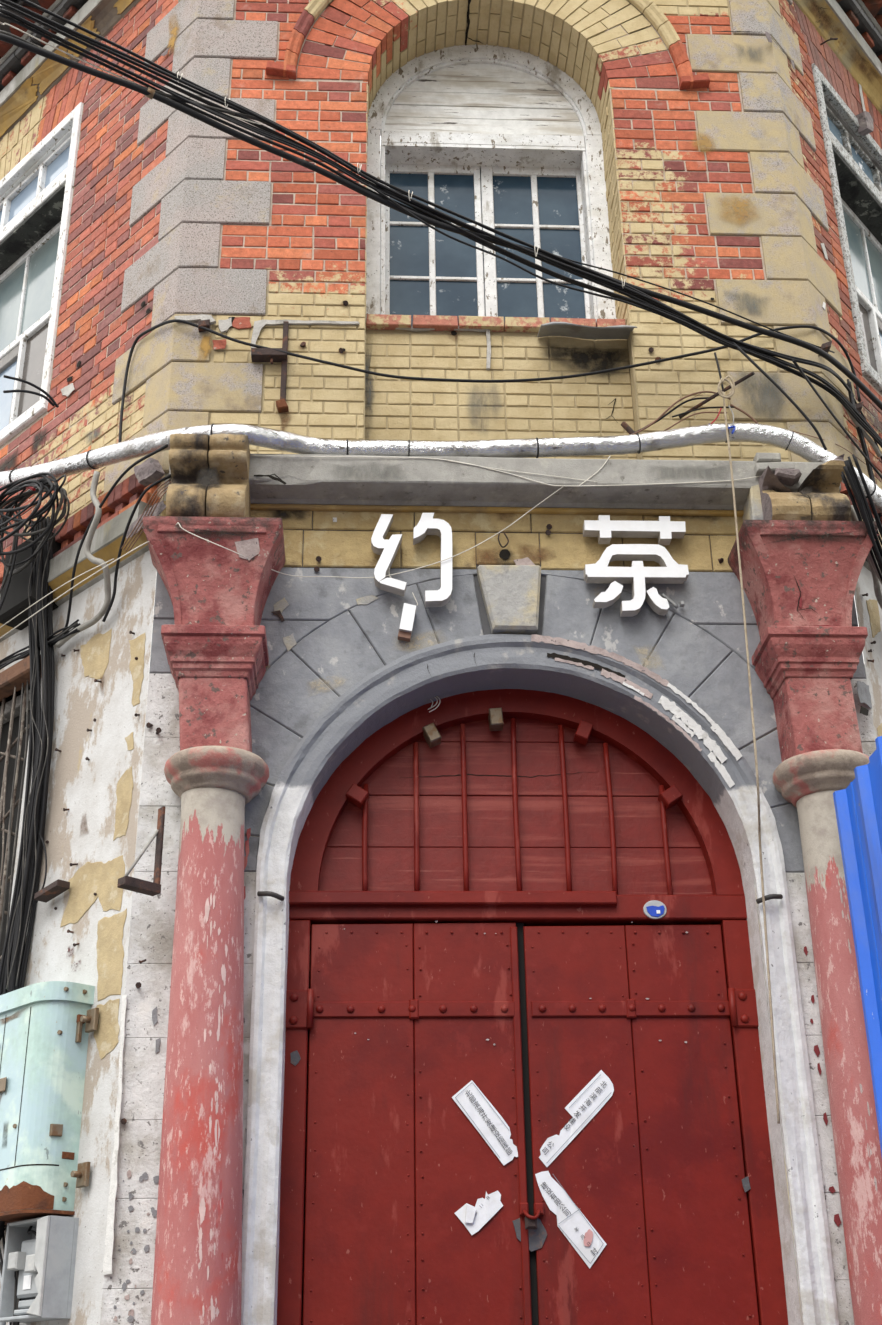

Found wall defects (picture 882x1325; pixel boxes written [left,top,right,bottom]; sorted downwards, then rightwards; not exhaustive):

crack [465,0,483,46]
peeling [235,538,260,560]
peeling [80,628,112,680]
peeling [129,633,146,707]
peeling [125,732,134,750]
peeling [531,634,742,788]
peeling [113,766,133,841]
peeling [204,874,233,1042]
peeling [60,855,160,1325]
peeling [209,1064,222,1158]
rust [0,1181,54,1213]
peeling [198,1201,223,1321]